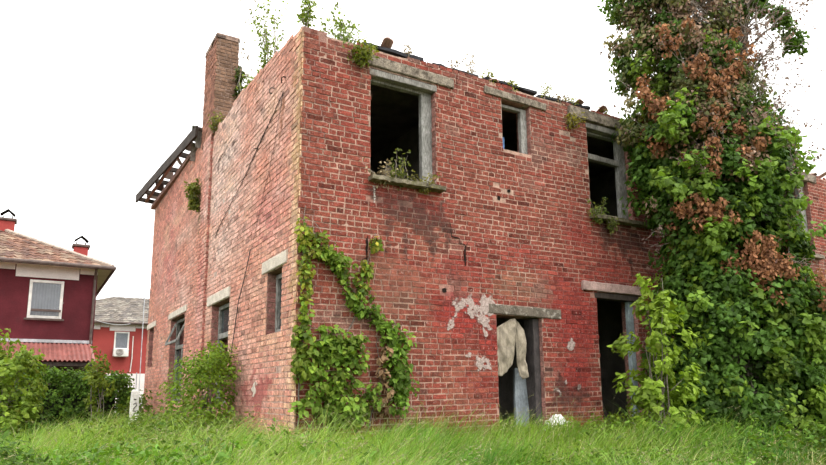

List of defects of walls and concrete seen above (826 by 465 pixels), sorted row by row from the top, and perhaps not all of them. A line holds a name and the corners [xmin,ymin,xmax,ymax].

spalling [447,294,495,337]
spalling [465,352,492,371]